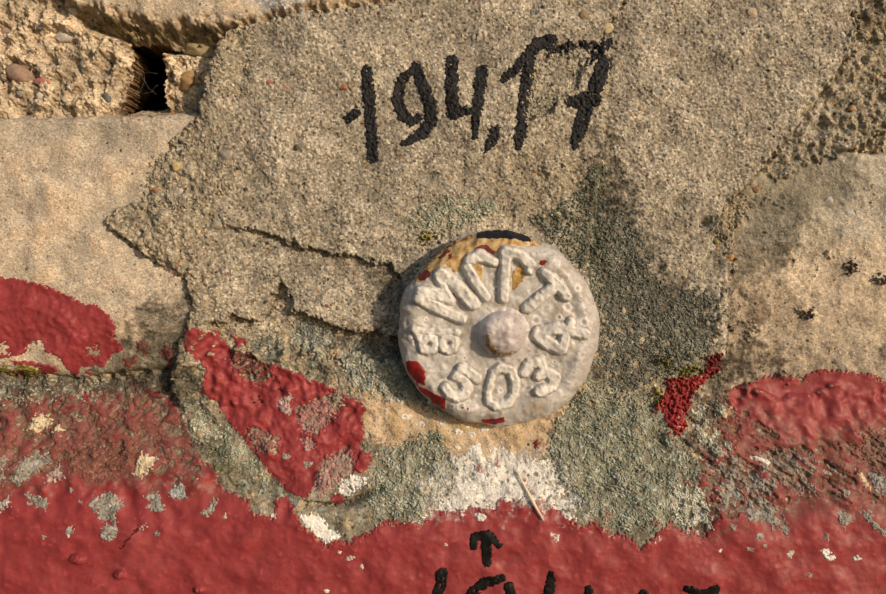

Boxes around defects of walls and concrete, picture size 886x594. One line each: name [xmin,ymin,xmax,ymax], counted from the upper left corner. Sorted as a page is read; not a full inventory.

peeling [0,276,149,377]
peeling [23,413,64,437]
peeling [183,326,373,505]
peeling [0,439,159,542]
peeling [142,482,187,513]
peeling [200,497,219,518]
peeling [707,426,886,552]
peeling [821,533,836,561]